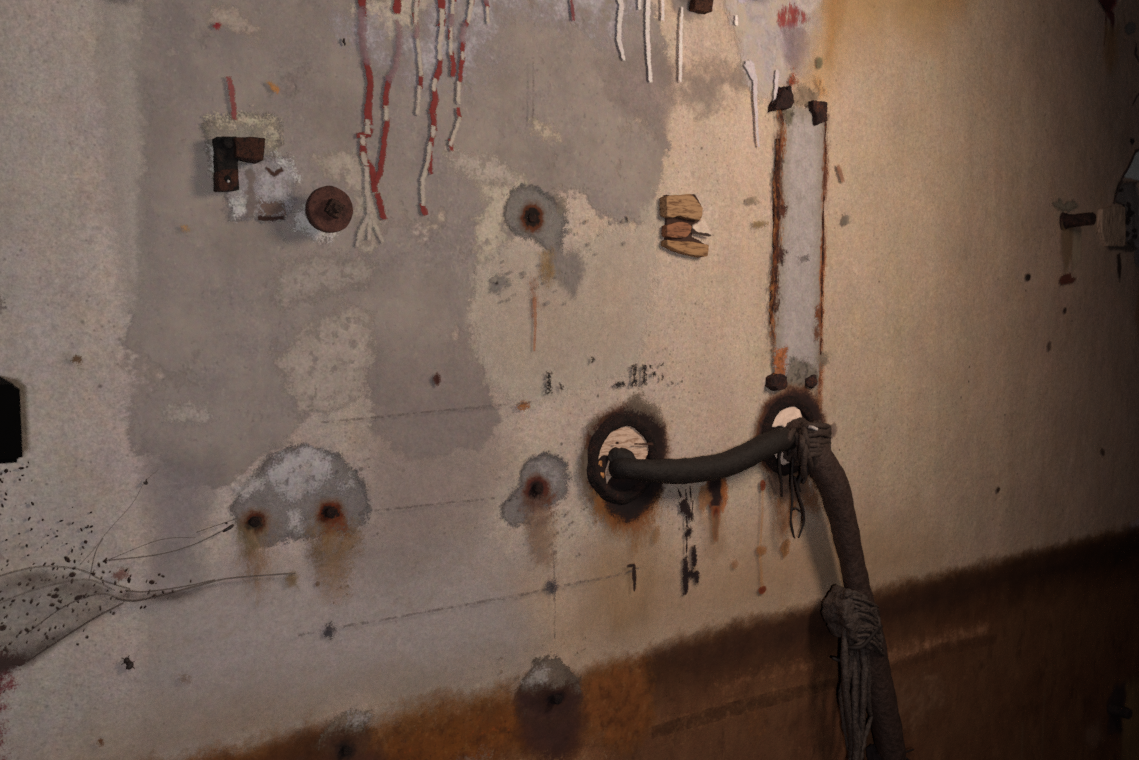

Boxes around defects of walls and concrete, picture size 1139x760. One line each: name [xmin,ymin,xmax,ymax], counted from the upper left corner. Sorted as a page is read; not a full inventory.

corrosion [519,202,545,233]
corrosion [753,109,827,437]
corrosion [238,510,269,557]
corrosion [312,500,358,577]
corrosion [520,475,555,528]
corrosion [576,389,671,551]
corrosion [757,461,821,558]
leakage [351,606,852,760]
leakage [873,527,1139,760]
leakage [188,726,336,760]